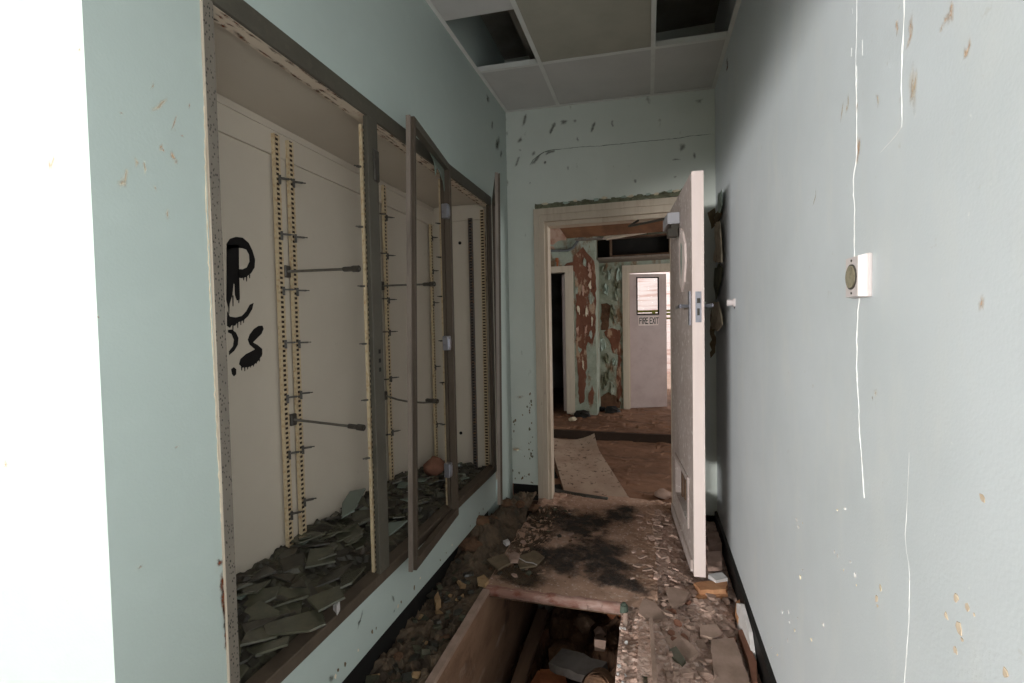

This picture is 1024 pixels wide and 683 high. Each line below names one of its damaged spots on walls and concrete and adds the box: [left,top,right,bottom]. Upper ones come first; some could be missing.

crack [851,0,905,257]
flaking render [564,247,622,408]
peeling [708,190,723,358]
crack [856,298,865,498]
crack [903,466,911,683]